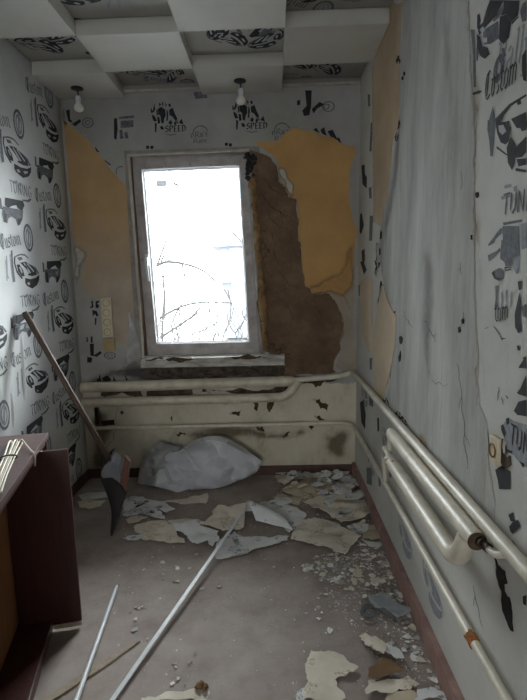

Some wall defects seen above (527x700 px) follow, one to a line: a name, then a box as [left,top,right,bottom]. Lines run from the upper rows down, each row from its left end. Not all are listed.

flaking render [326,263,357,373]
flaking render [141,354,285,379]
flaking render [101,387,288,397]
spalling [309,398,329,430]
leakage [330,434,346,455]